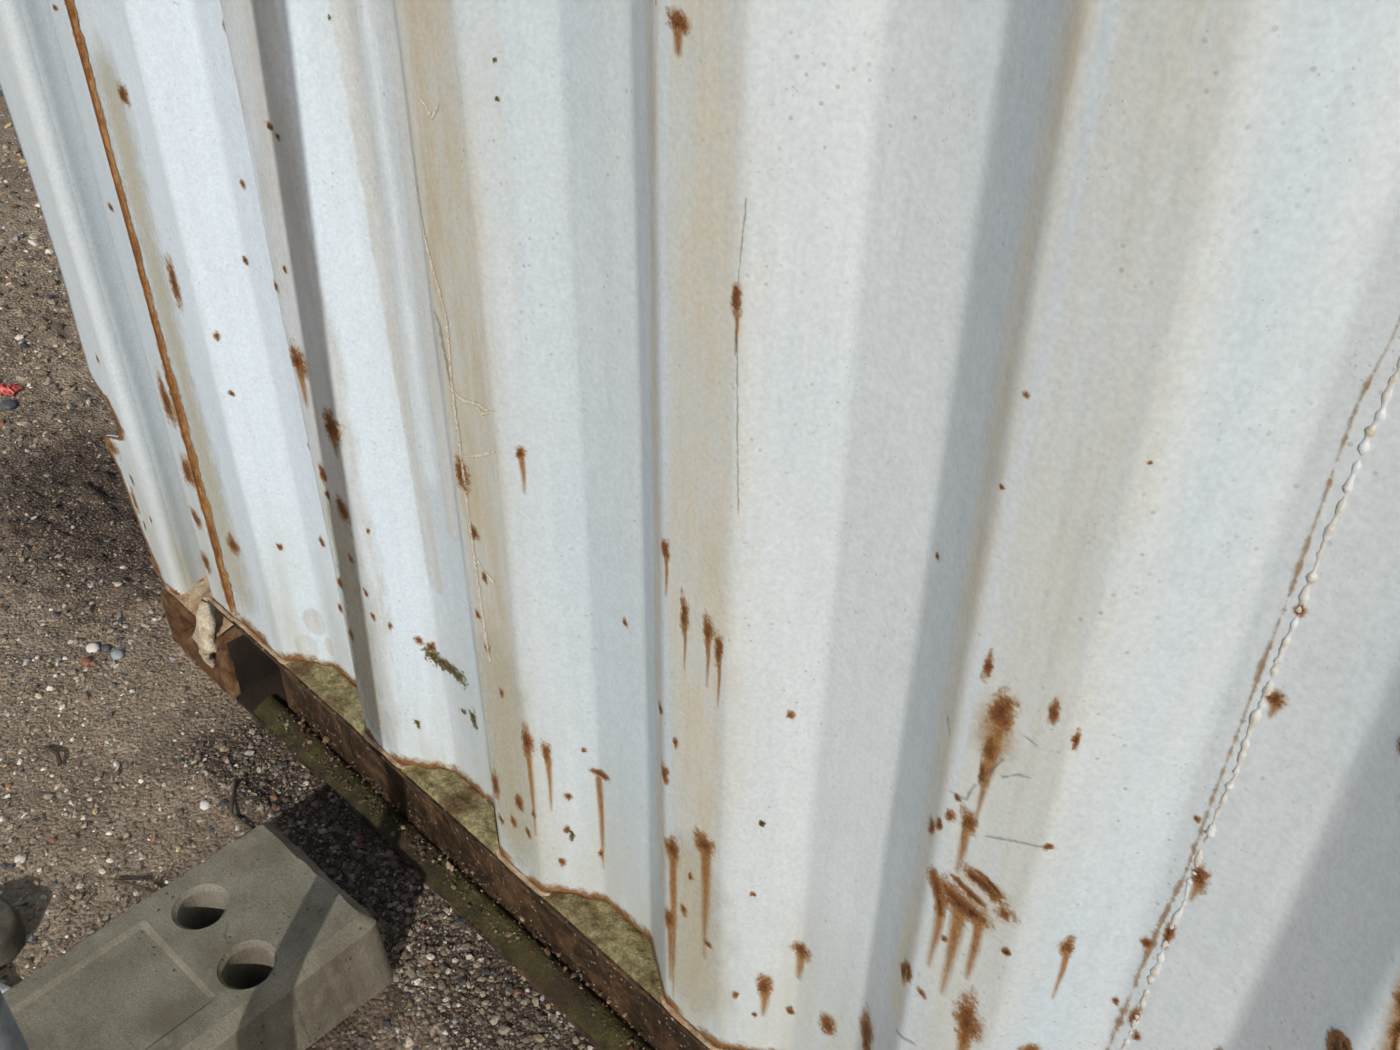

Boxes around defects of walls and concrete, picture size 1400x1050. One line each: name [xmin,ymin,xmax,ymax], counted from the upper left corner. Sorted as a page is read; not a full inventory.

corrosion [667,10,688,54]
corrosion [52,0,357,686]
corrosion [731,283,742,350]
corrosion [661,540,723,696]
corrosion [391,723,572,865]
corrosion [590,768,610,857]
corrosion [928,649,1019,863]
corrosion [952,994,982,1050]
corrosion [1384,992,1400,1050]